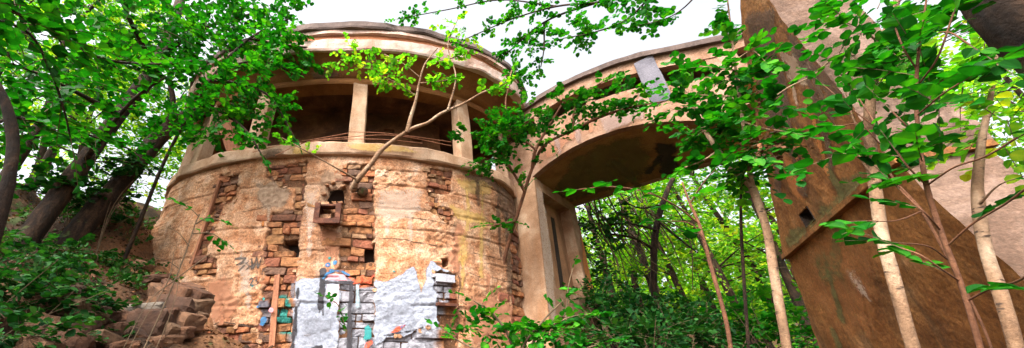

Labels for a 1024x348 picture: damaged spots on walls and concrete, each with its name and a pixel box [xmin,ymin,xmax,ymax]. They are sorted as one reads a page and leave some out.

spalling [189,173,239,278]
spalling [213,163,465,348]
spalling [498,229,528,348]